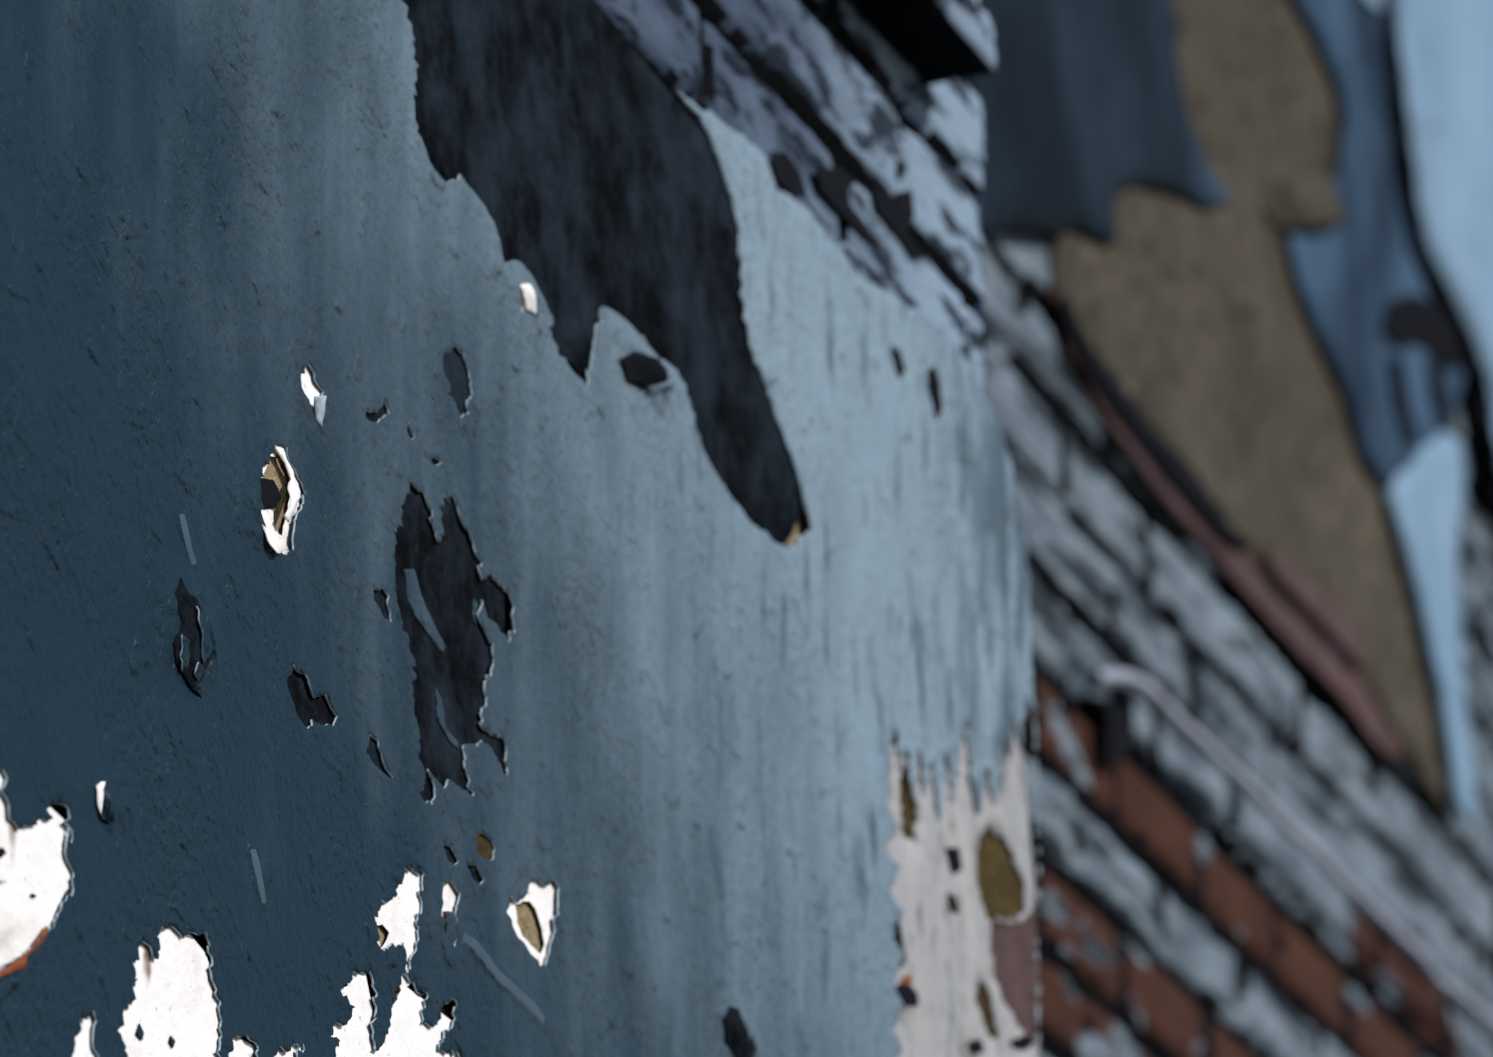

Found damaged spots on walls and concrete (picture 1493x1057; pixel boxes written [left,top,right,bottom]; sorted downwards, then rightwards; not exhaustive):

peeling [402,0,800,546]
peeling [260,446,303,555]
peeling [301,366,327,427]
spalling [1051,0,1477,823]
peeling [374,481,506,802]
peeling [0,771,73,1003]
peeling [72,1012,97,1057]
peeling [118,927,257,1057]
peeling [274,1045,303,1057]
peeling [332,870,458,1057]
peeling [507,879,558,966]
peeling [886,712,1040,1057]